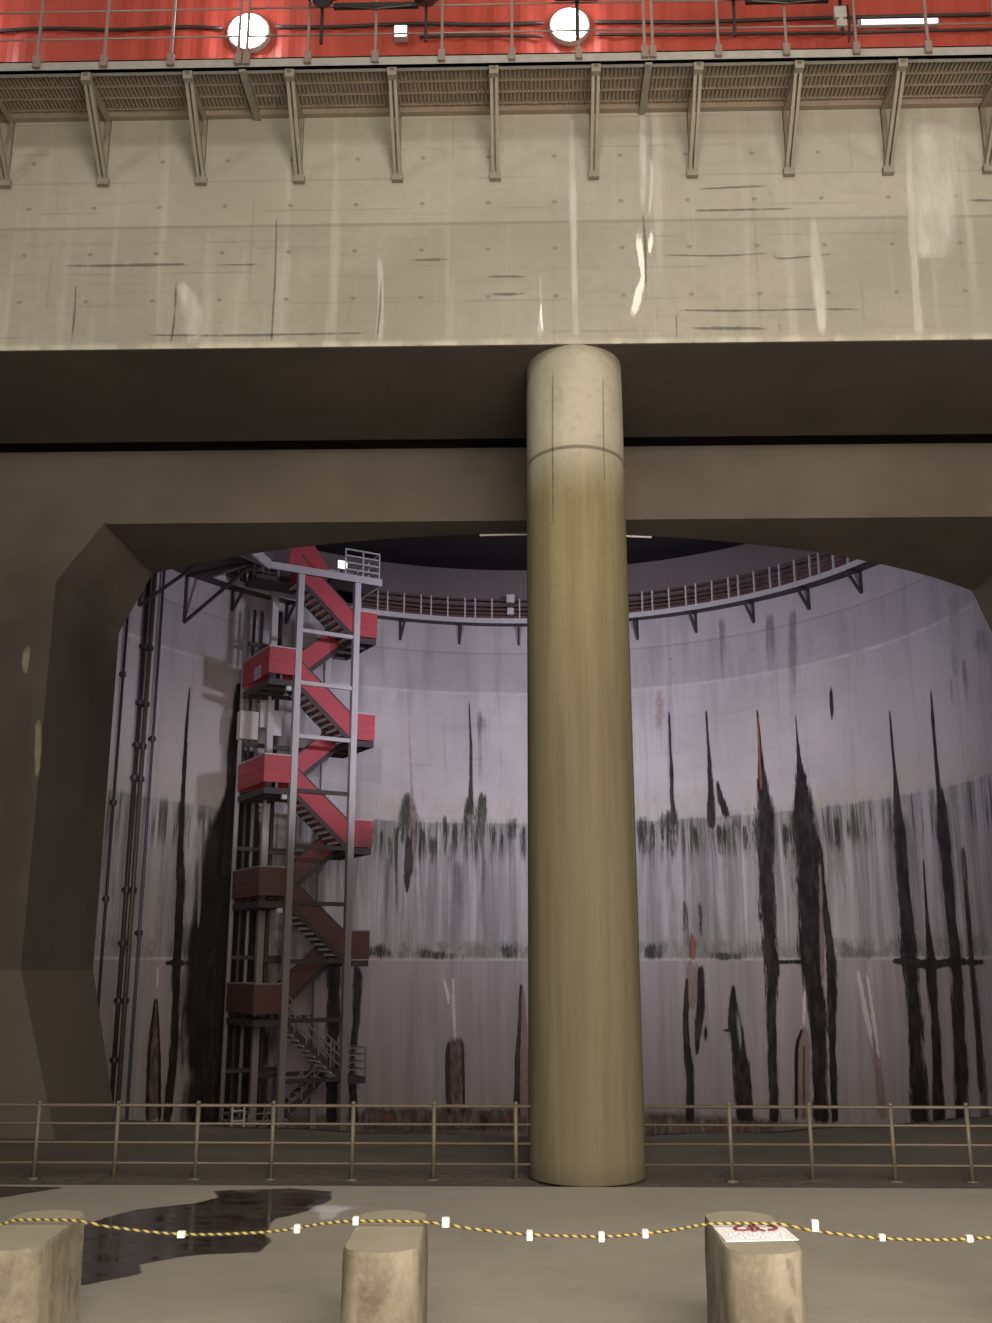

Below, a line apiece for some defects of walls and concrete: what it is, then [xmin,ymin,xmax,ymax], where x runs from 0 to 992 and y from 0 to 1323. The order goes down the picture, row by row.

leakage [906,128,951,330]
leakage [163,683,275,1126]
leakage [648,711,838,1134]
leakage [889,690,989,1123]